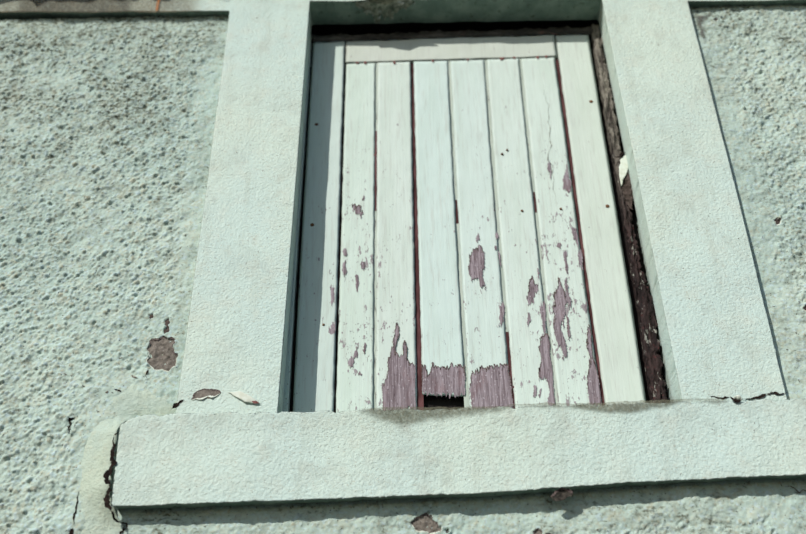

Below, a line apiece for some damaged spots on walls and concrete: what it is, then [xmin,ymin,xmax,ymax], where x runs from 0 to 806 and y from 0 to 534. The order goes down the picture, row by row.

flaking render [355,0,415,23]
peeling [468,233,486,290]
flaking render [132,319,178,378]
peeling [348,342,366,375]
peeling [382,323,514,410]
peeling [526,243,571,406]
peeling [586,324,601,406]
flaking render [172,388,261,408]
crack [711,392,784,403]
crack [103,430,128,534]
crack [69,491,79,534]
flaking render [411,513,450,534]